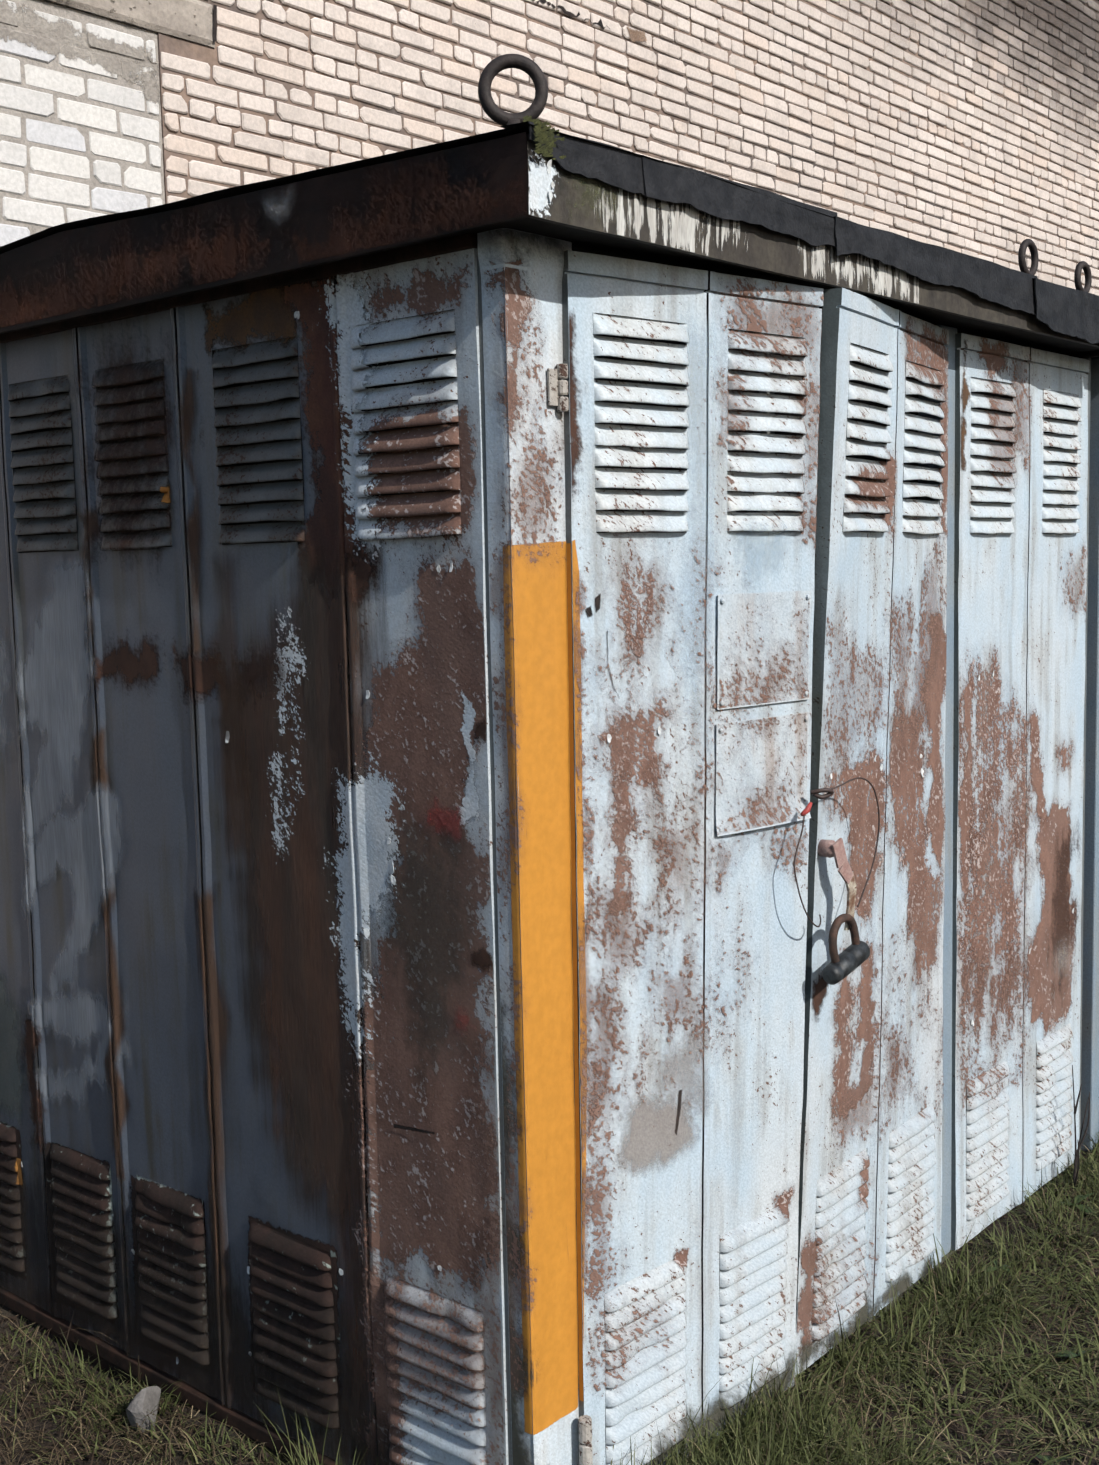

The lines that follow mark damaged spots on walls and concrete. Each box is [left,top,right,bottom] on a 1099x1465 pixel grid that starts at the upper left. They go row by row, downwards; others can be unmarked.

peeling [593,188,748,256]
peeling [798,238,919,304]
peeling [265,607,308,864]
corrosion [0,255,583,1465]
peeling [323,751,410,1065]
corrosion [574,316,1078,1396]